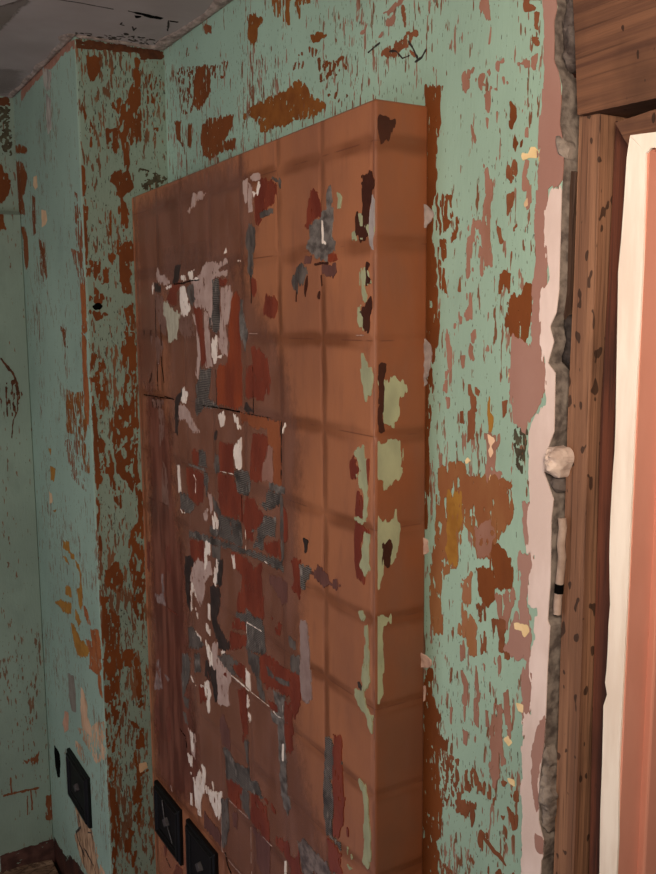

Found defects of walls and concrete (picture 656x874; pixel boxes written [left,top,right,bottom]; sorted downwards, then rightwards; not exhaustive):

crack [62,0,178,31]
peeling [247,13,263,47]
peeling [272,0,310,25]
peeling [378,0,419,59]
peeling [174,31,348,161]
peeling [0,0,233,874]